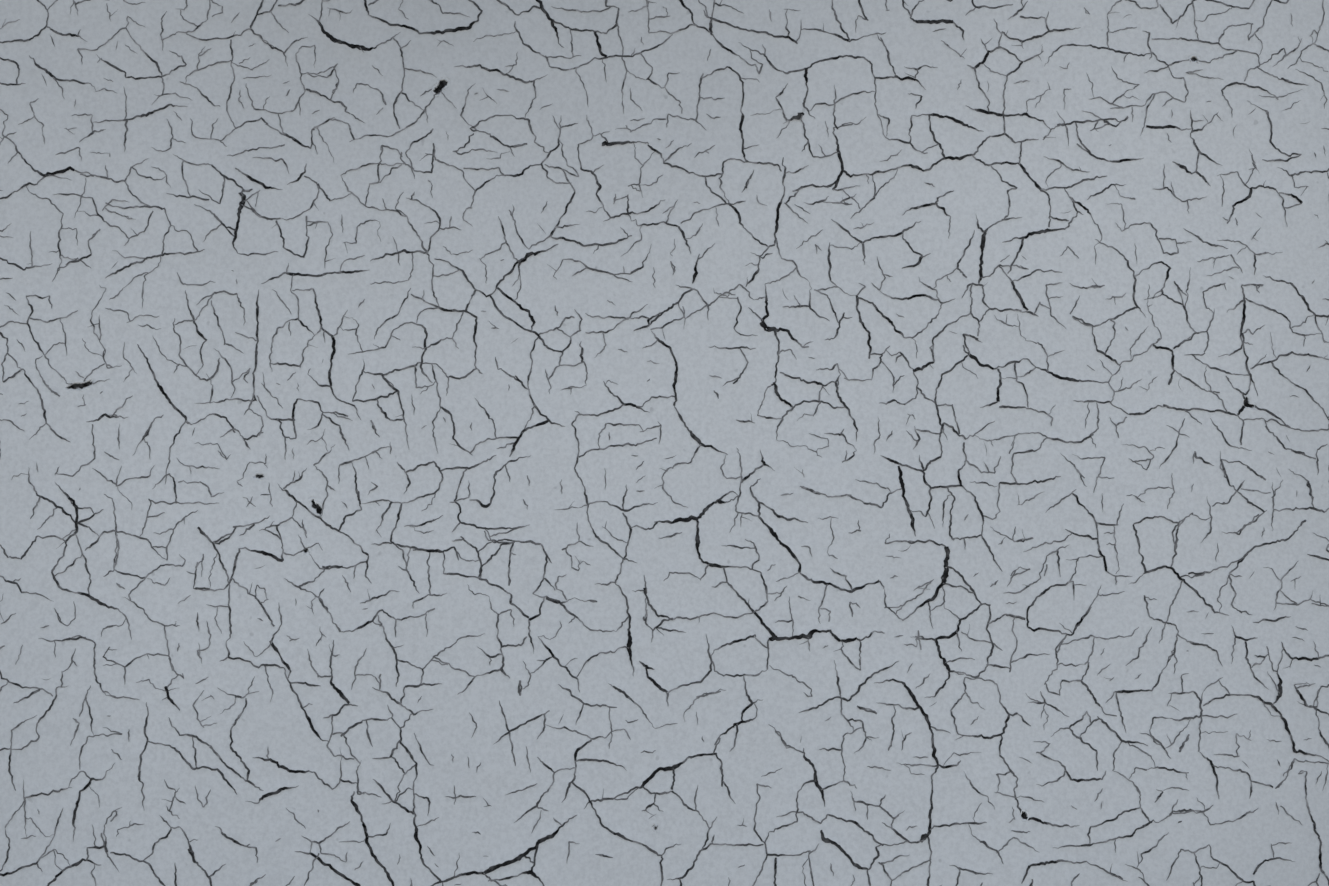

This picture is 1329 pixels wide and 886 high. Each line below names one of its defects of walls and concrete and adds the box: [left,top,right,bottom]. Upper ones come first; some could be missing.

crack [903,183,953,239]
crack [1155,165,1205,213]
crack [1087,184,1282,279]
crack [547,247,655,287]
crack [0,285,120,442]
crack [709,345,756,399]
crack [55,396,163,509]
crack [1060,453,1112,509]
crack [0,576,76,626]
crack [215,826,266,886]
crack [950,865,992,886]
crack [1126,832,1169,886]